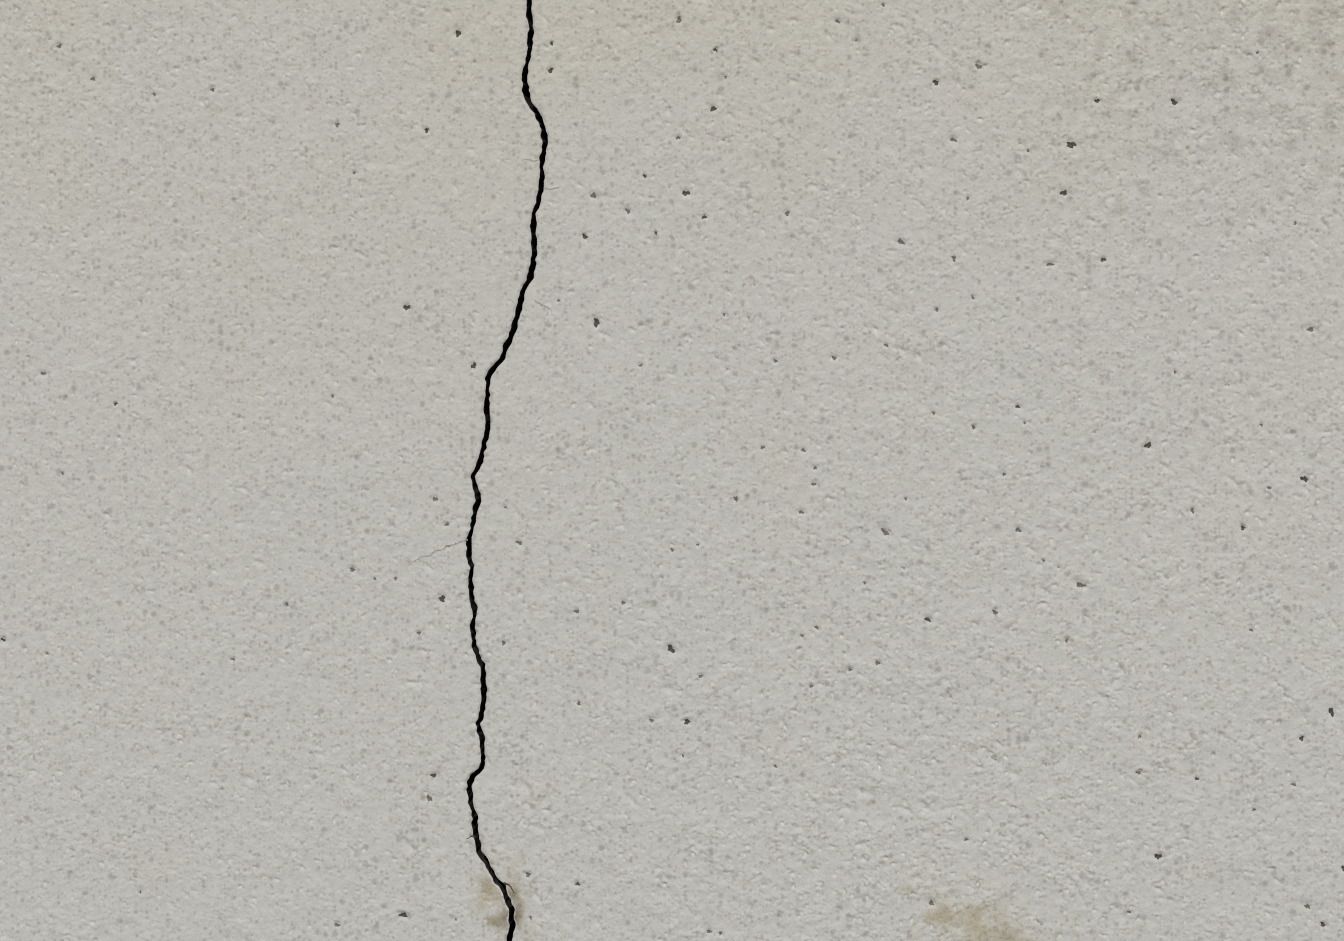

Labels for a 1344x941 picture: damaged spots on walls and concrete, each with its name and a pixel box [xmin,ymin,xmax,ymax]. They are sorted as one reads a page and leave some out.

crack [413,0,560,941]